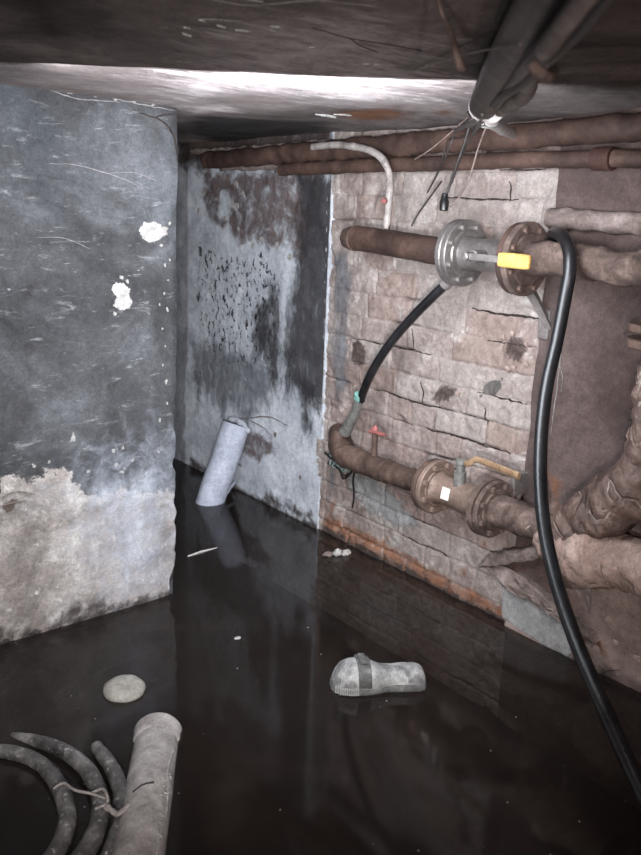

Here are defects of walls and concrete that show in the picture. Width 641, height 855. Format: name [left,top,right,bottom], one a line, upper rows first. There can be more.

spalling [139,221,171,247]
spalling [112,276,132,316]
damp [194,175,331,435]
crack [352,328,431,355]
crack [472,308,539,319]
crack [374,382,526,454]
crack [550,356,563,434]
peeling [0,460,176,642]
rust [324,519,453,593]
crack [376,502,449,557]